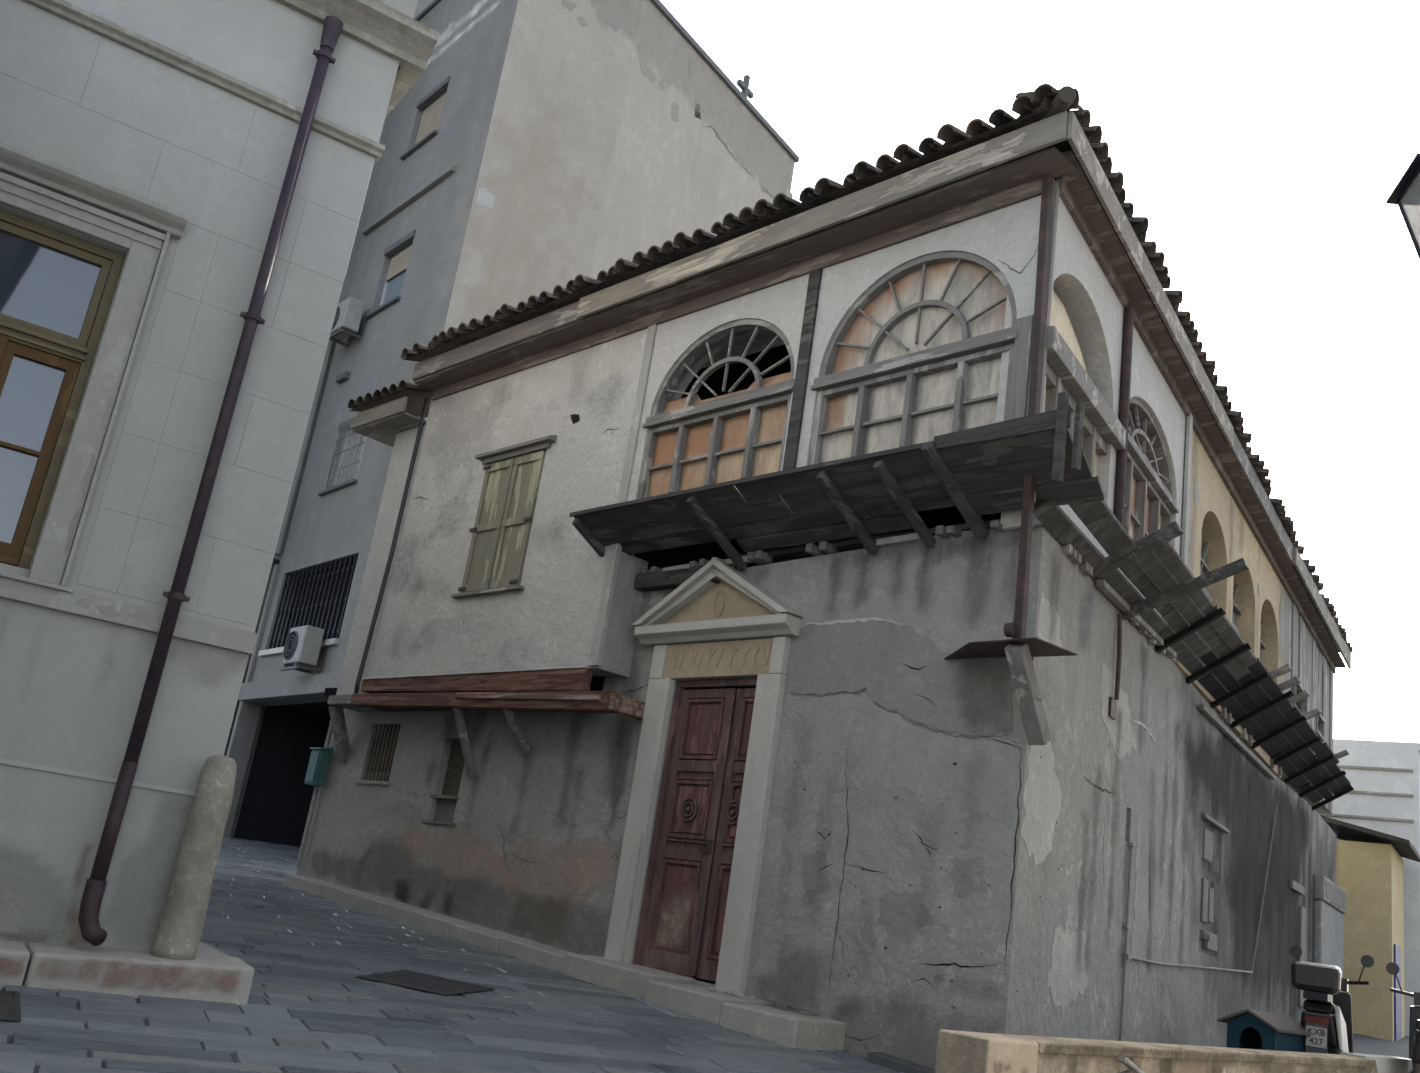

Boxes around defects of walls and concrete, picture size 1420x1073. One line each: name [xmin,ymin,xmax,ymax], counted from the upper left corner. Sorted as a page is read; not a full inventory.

crack [817,750,894,1000]
damp [1233,793,1310,999]